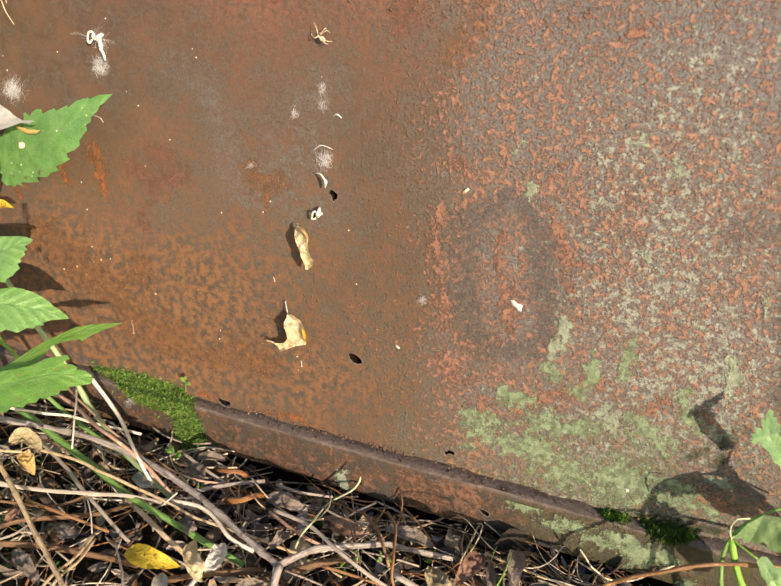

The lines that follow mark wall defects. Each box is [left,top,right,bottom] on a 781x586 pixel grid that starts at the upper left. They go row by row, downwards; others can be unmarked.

rust [416,193,459,332]
water stain [539,338,639,403]
water stain [458,383,706,461]
water stain [506,500,543,514]
water stain [660,477,728,534]